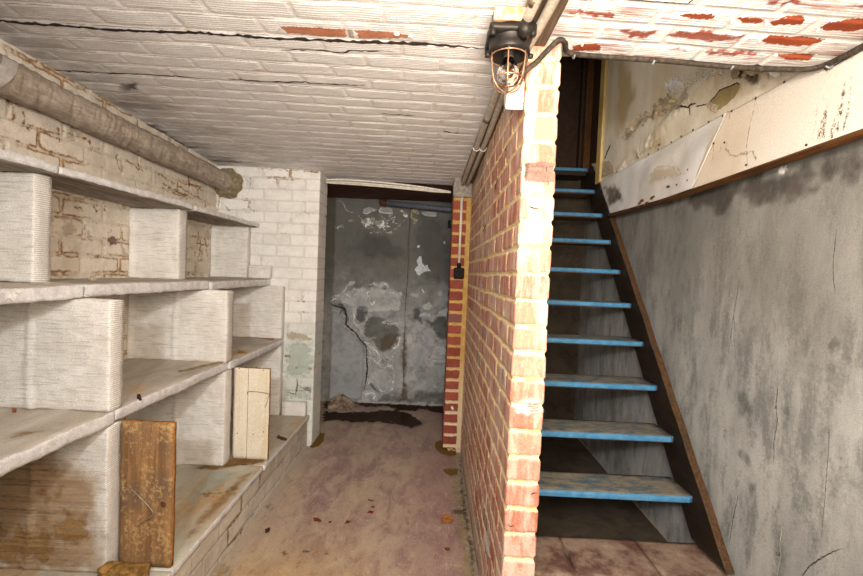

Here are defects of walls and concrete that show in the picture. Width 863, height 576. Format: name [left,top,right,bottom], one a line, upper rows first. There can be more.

peeling [570,9,614,18]
crack [0,20,484,54]
peeling [572,43,602,53]
peeling [621,29,656,38]
crack [231,78,364,86]
peeling [415,245,430,275]
crack [329,302,374,389]
crack [802,440,840,576]